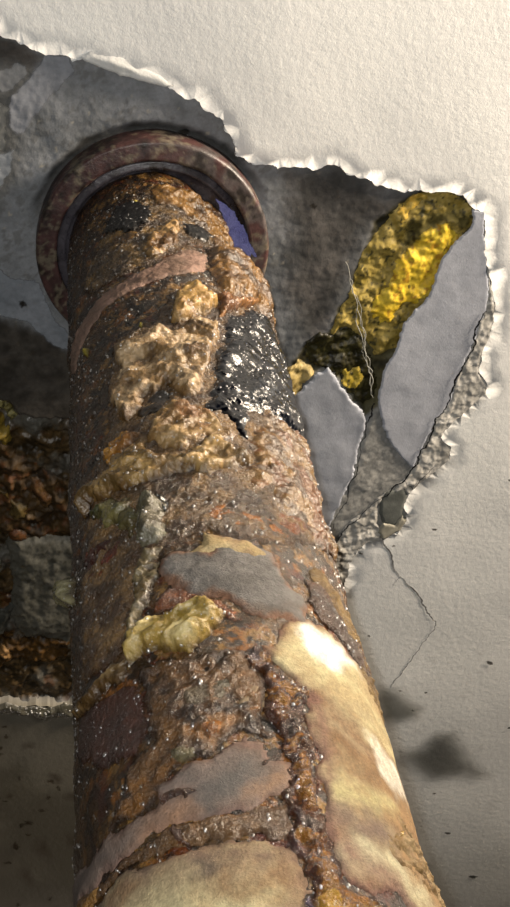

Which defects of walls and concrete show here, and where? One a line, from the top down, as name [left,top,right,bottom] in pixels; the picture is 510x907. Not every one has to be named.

corrosion [148,183,279,344]
spalling [0,36,495,585]
spalling [0,651,72,702]
peeling [52,575,77,609]
corrosion [84,490,168,580]
corrosion [153,587,198,612]
corrosion [108,649,275,832]
corrosion [209,413,339,562]
corrosion [308,567,385,726]
crack [382,538,436,686]
corrosion [76,800,293,907]
corrosion [388,812,446,907]